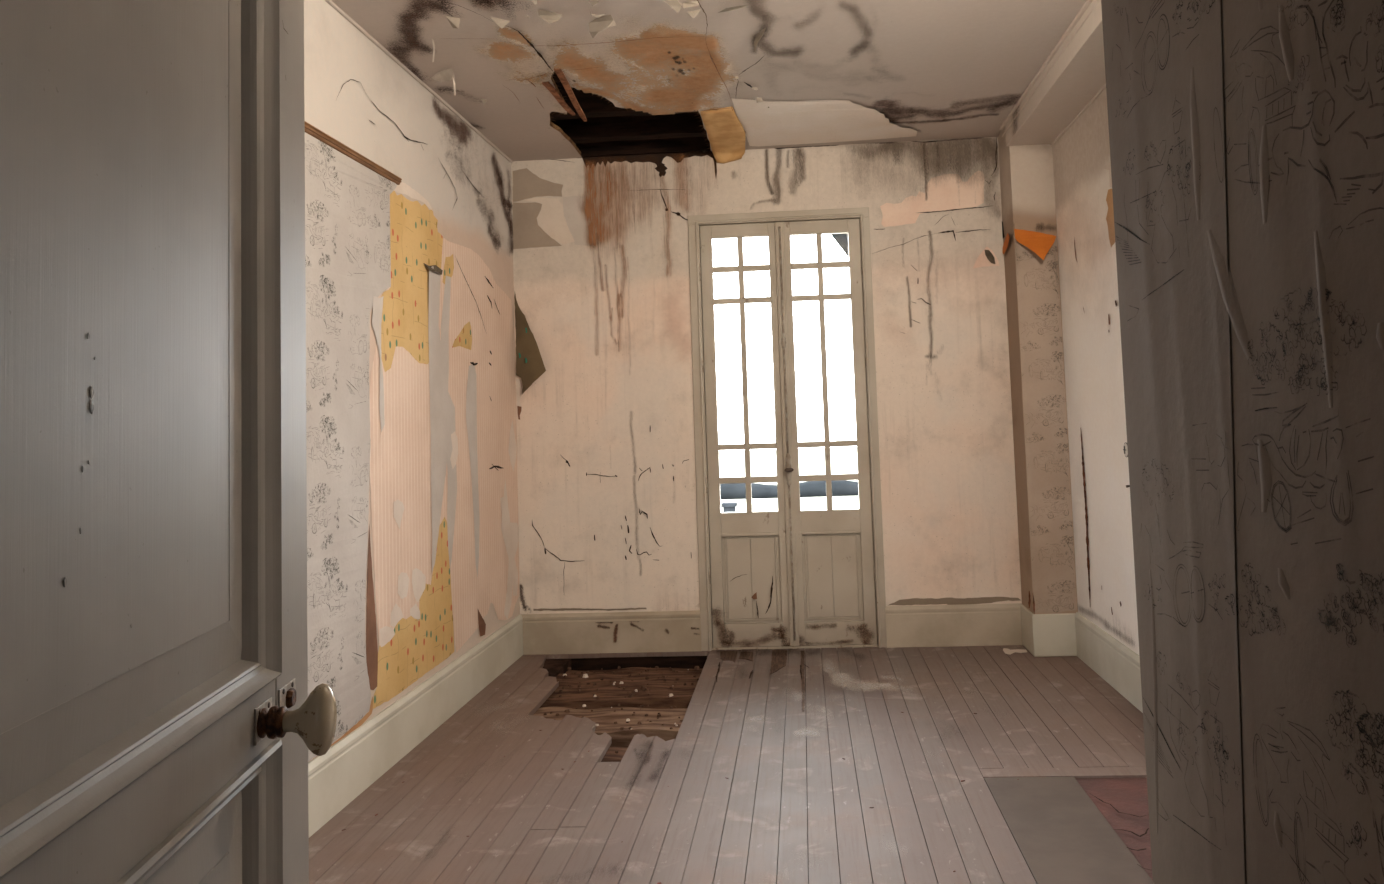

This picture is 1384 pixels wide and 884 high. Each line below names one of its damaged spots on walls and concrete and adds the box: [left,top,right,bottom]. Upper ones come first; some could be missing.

leakage [388,0,449,79]
crack [439,0,668,107]
leakage [556,26,733,115]
crack [697,0,800,131]
leakage [433,89,485,174]
leakage [478,155,513,253]
leakage [582,163,641,247]
spalling [583,151,717,177]
peeling [880,171,985,227]
crack [532,509,659,574]
flaking render [366,525,378,690]
flaking render [478,610,486,636]